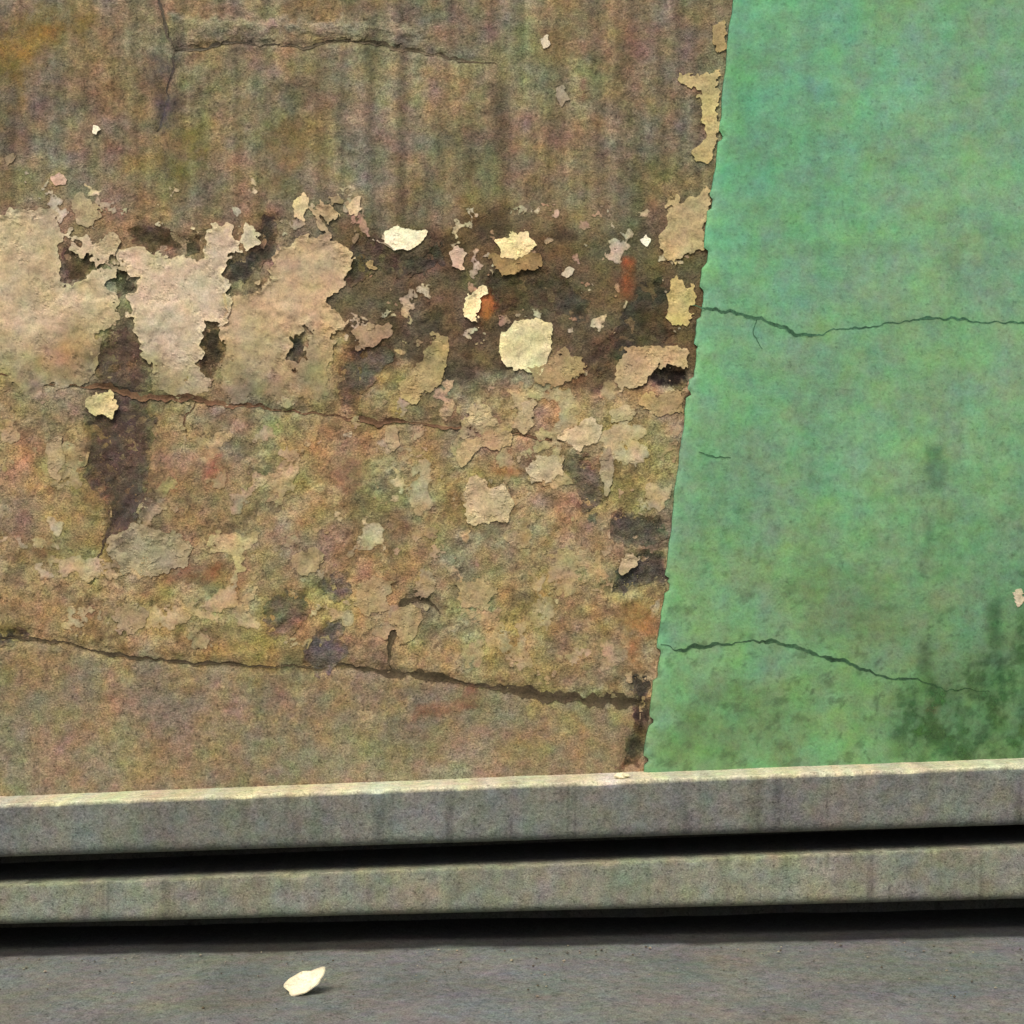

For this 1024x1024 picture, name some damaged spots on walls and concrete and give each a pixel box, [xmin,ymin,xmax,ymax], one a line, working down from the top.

peeling [712,20,728,53]
crack [156,0,496,132]
peeling [678,69,721,164]
crack [693,305,1024,348]
leakage [100,390,136,430]
crack [48,382,475,432]
crack [512,432,550,442]
peeling [0,173,711,771]
crack [0,596,644,709]
crack [661,638,990,692]